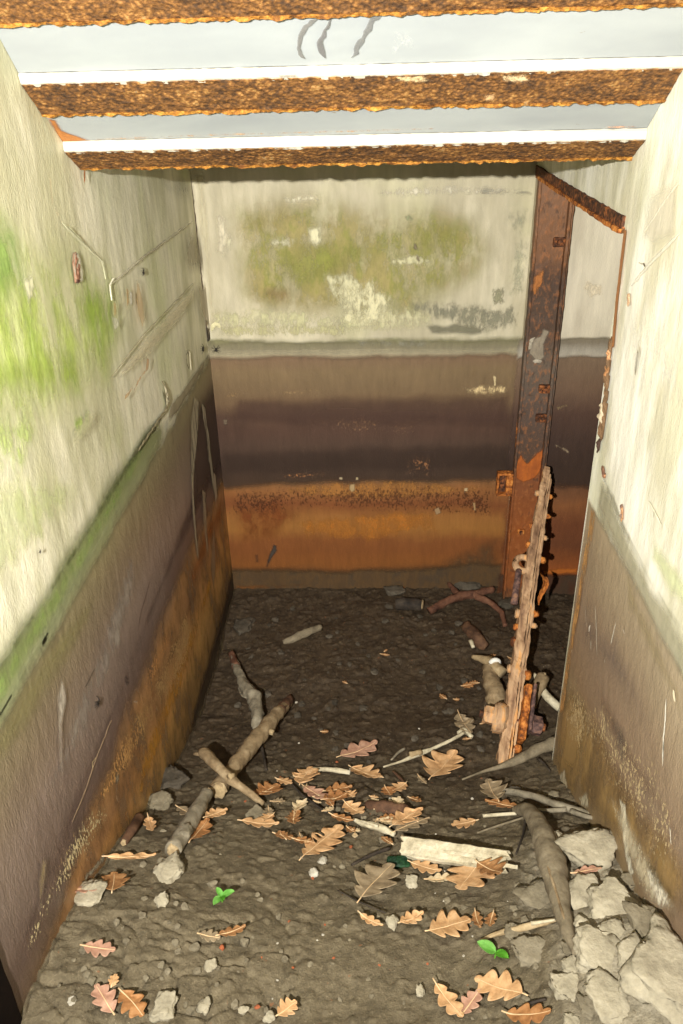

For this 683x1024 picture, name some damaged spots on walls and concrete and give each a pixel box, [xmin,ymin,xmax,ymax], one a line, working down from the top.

corrosion [0,3,683,28]
corrosion [80,157,633,183]
water stain [188,237,203,264]
corrosion [533,271,543,294]
corrosion [612,230,631,347]
corrosion [516,451,542,482]
water stain [0,282,524,1013]
corrosion [538,486,682,899]
corrosion [49,480,510,951]